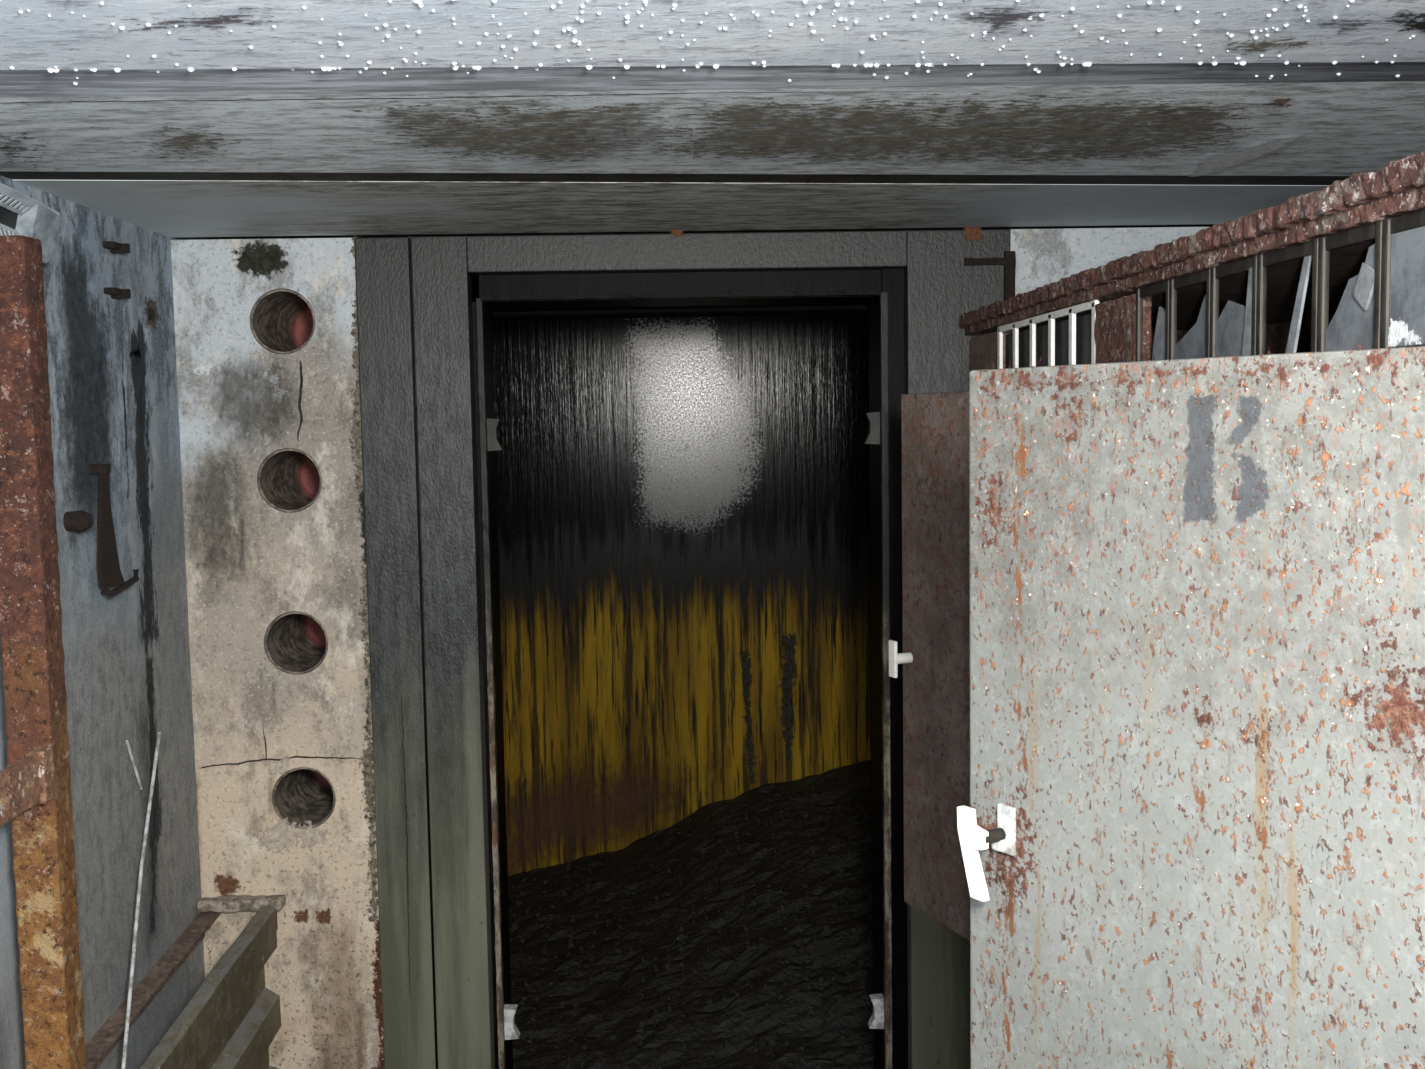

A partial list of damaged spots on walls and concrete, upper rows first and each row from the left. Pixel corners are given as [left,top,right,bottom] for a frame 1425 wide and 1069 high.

leakage [1223,10,1425,57]
leakage [352,91,1303,177]
leakage [234,240,288,280]